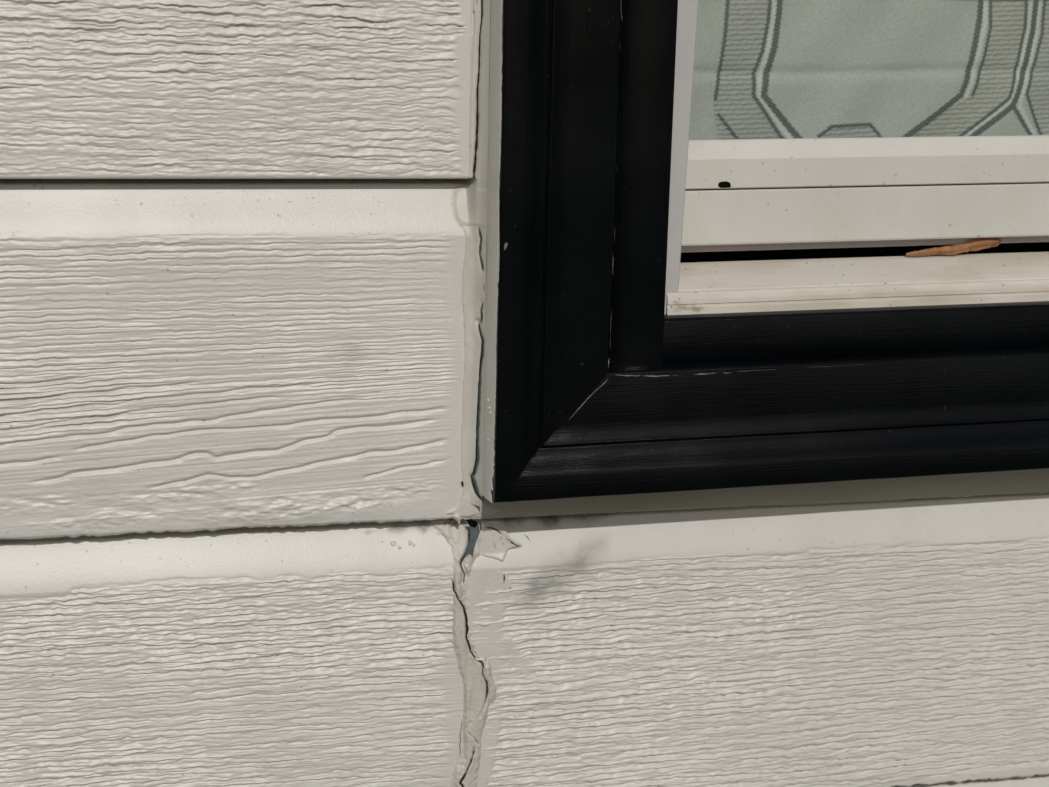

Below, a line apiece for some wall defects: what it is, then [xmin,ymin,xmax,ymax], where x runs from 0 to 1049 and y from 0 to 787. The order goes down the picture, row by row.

crack [471,228,484,502]
crack [452,564,488,703]
crack [459,724,479,787]